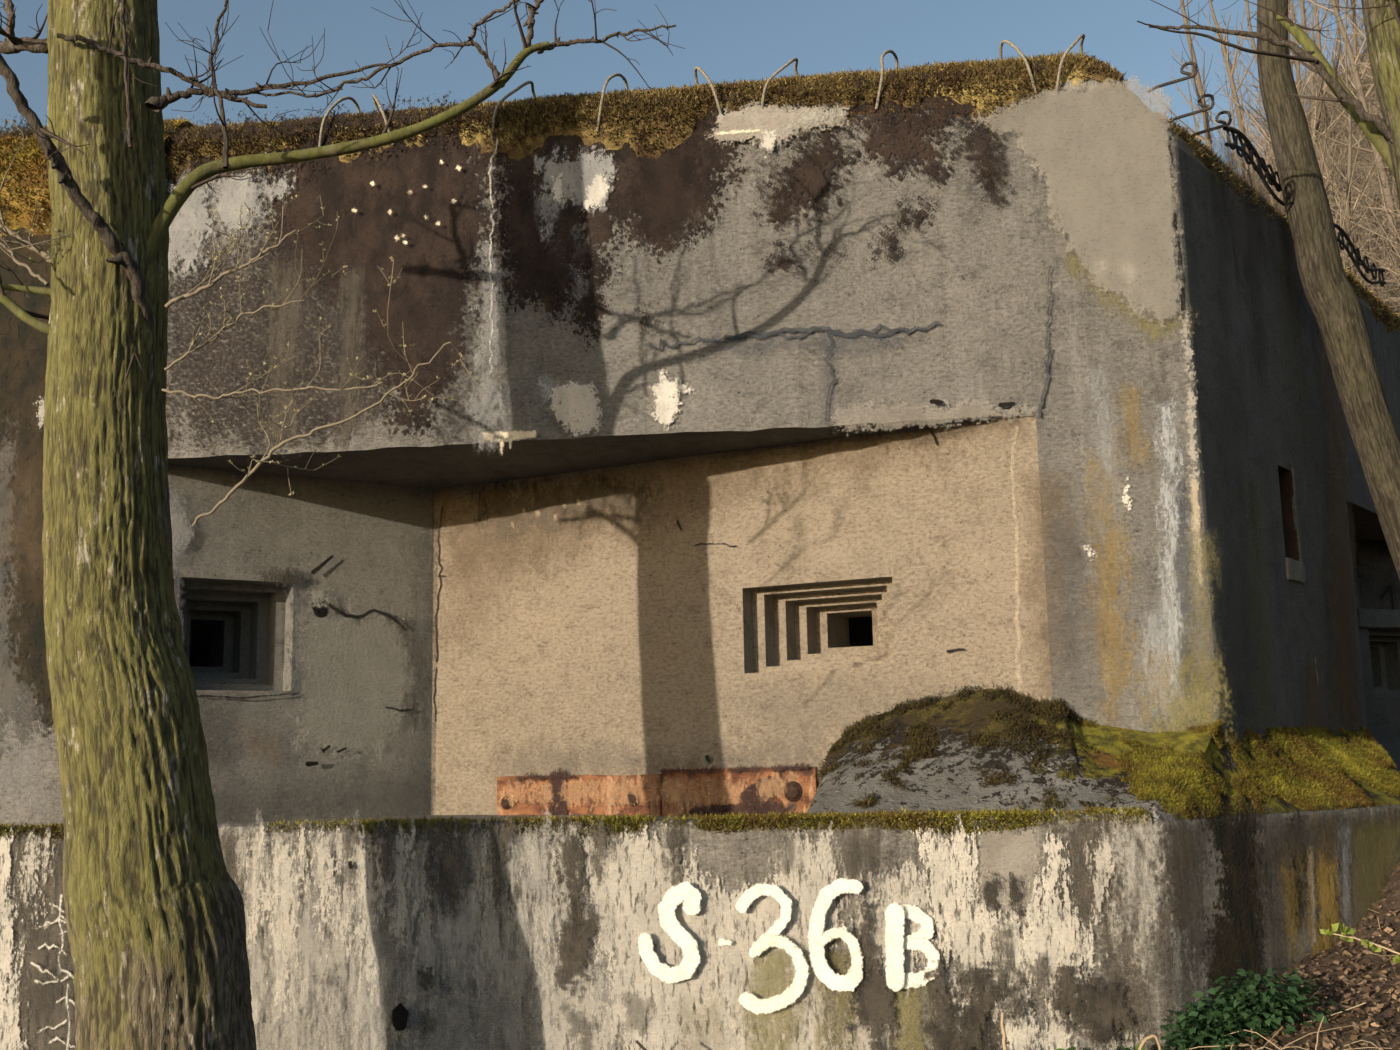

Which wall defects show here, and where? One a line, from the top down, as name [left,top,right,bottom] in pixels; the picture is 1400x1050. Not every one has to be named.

damp [163,55,1053,459]
crack [649,321,941,420]
damp [0,227,55,759]
efflorescence [1155,402,1194,731]
damp [7,823,76,1050]
damp [220,829,247,906]
damp [292,818,615,931]
corrosion [516,768,576,815]
damp [661,822,685,885]
corrosion [660,762,809,816]
damp [843,811,1172,1050]
damp [1190,800,1271,1015]